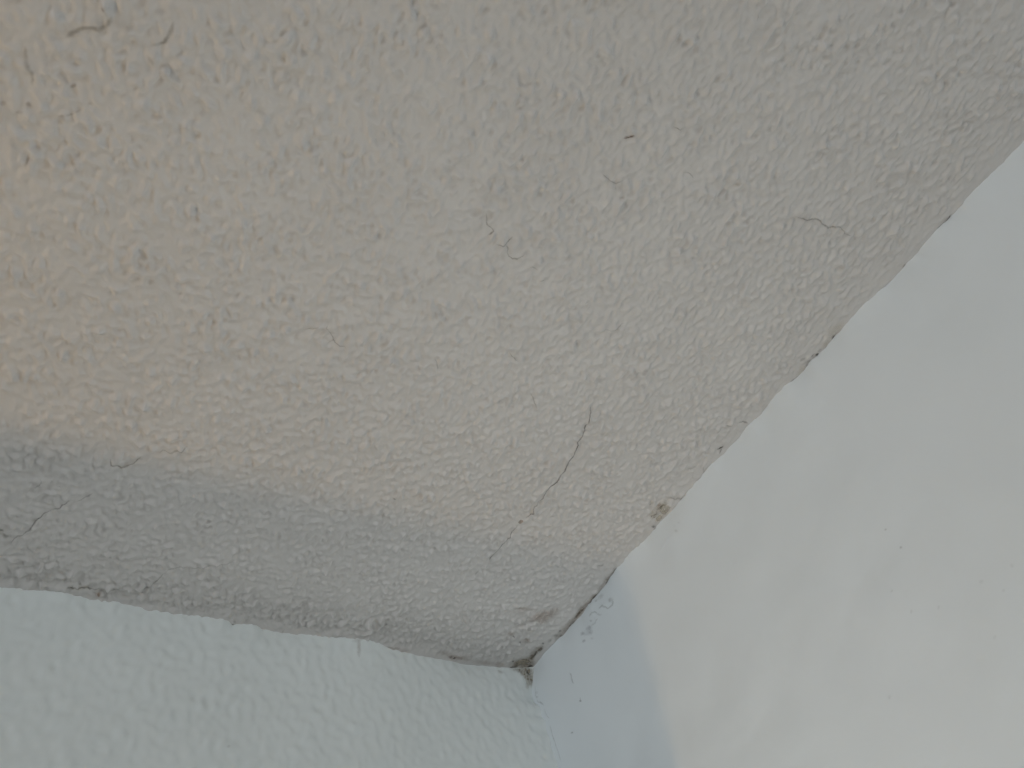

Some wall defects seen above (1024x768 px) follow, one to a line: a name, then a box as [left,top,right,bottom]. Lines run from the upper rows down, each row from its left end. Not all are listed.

crack [488,413,591,561]